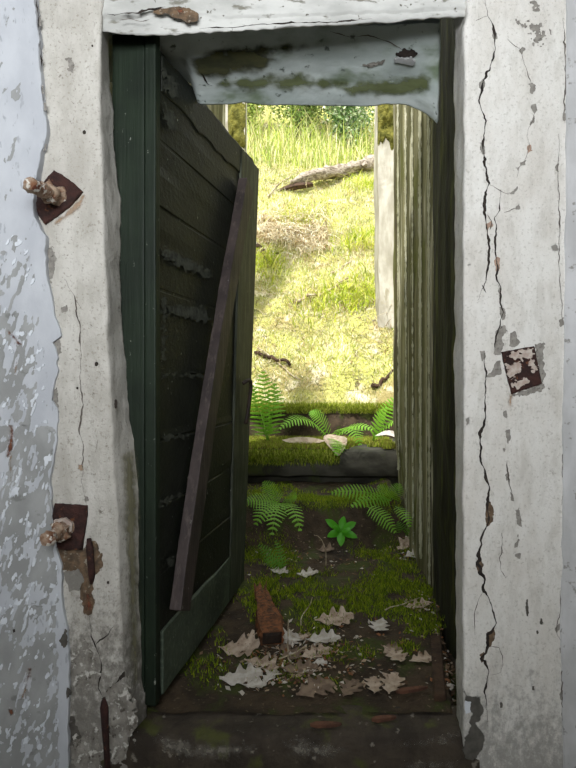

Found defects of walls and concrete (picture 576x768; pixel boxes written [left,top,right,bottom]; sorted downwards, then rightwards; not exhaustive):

peeling [2,82,21,101]
spalling [363,48,418,68]
peeling [0,235,103,768]
crack [66,281,98,502]
water stain [192,46,434,585]
crack [474,3,537,720]
peeling [69,680,138,768]
crack [89,615,125,697]